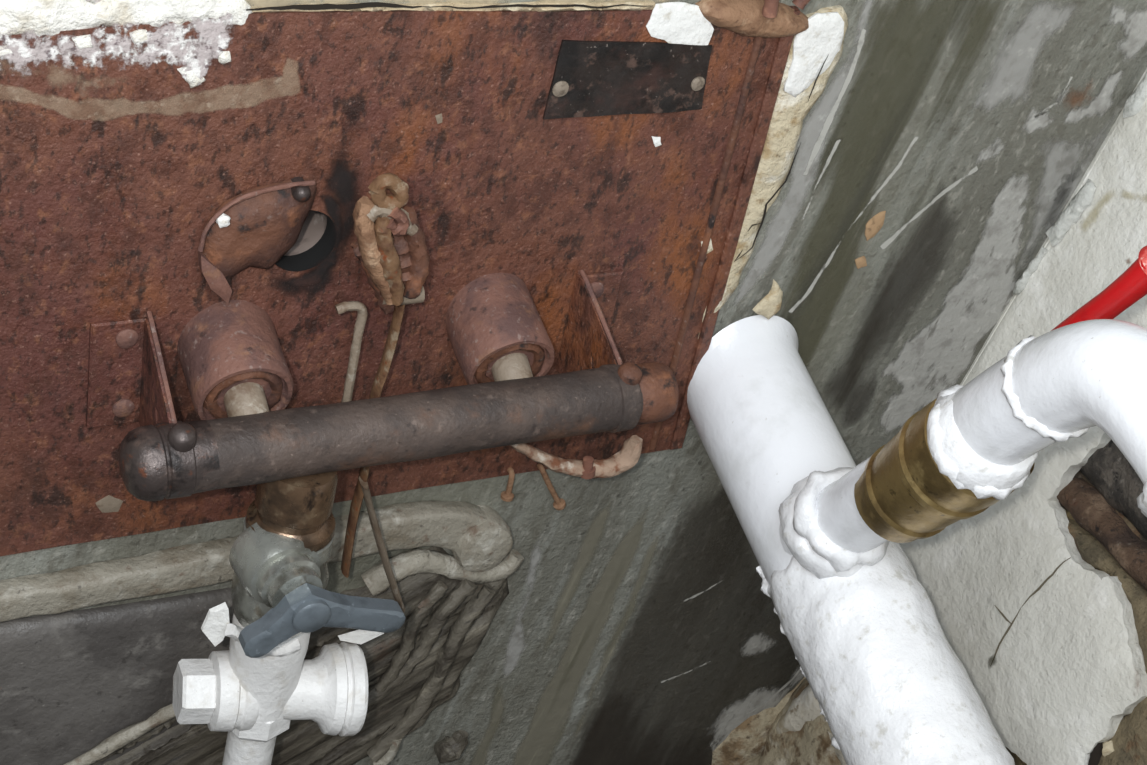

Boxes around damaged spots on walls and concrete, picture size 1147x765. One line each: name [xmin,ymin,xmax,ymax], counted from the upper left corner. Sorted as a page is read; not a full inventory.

spalling [1057,440,1147,673]
spalling [744,633,774,655]
crack [989,557,1071,667]
spalling [711,668,846,765]
spalling [1005,747,1027,765]
spalling [1088,697,1147,765]